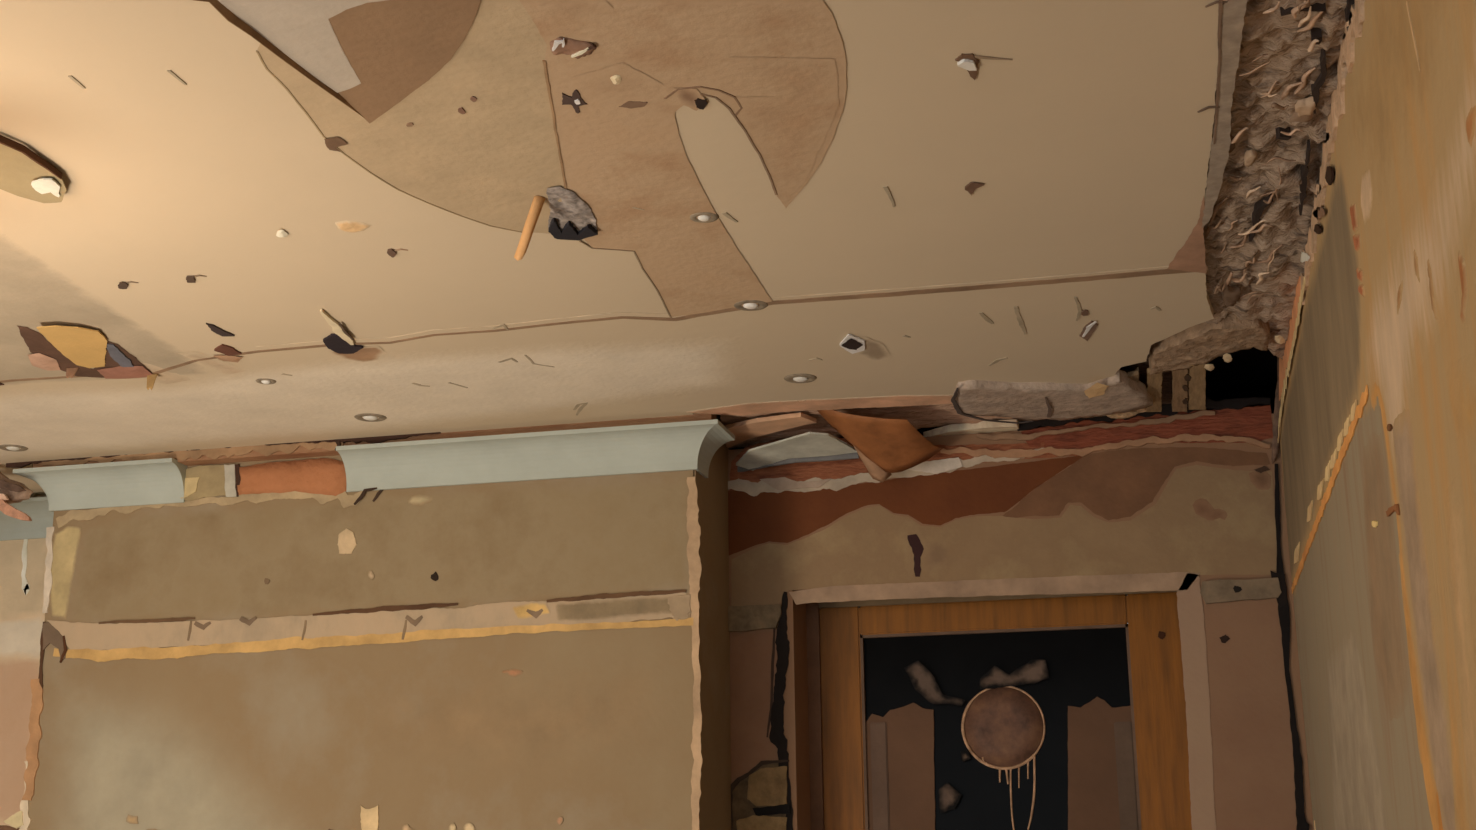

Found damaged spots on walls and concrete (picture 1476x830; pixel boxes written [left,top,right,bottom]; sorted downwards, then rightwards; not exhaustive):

peeling [0,135,67,203]
peeling [218,0,847,318]
flaking render [18,325,158,390]
peeling [684,0,1433,830]
flaking render [0,442,691,830]
crack [766,592,793,830]
crack [940,396,1316,830]